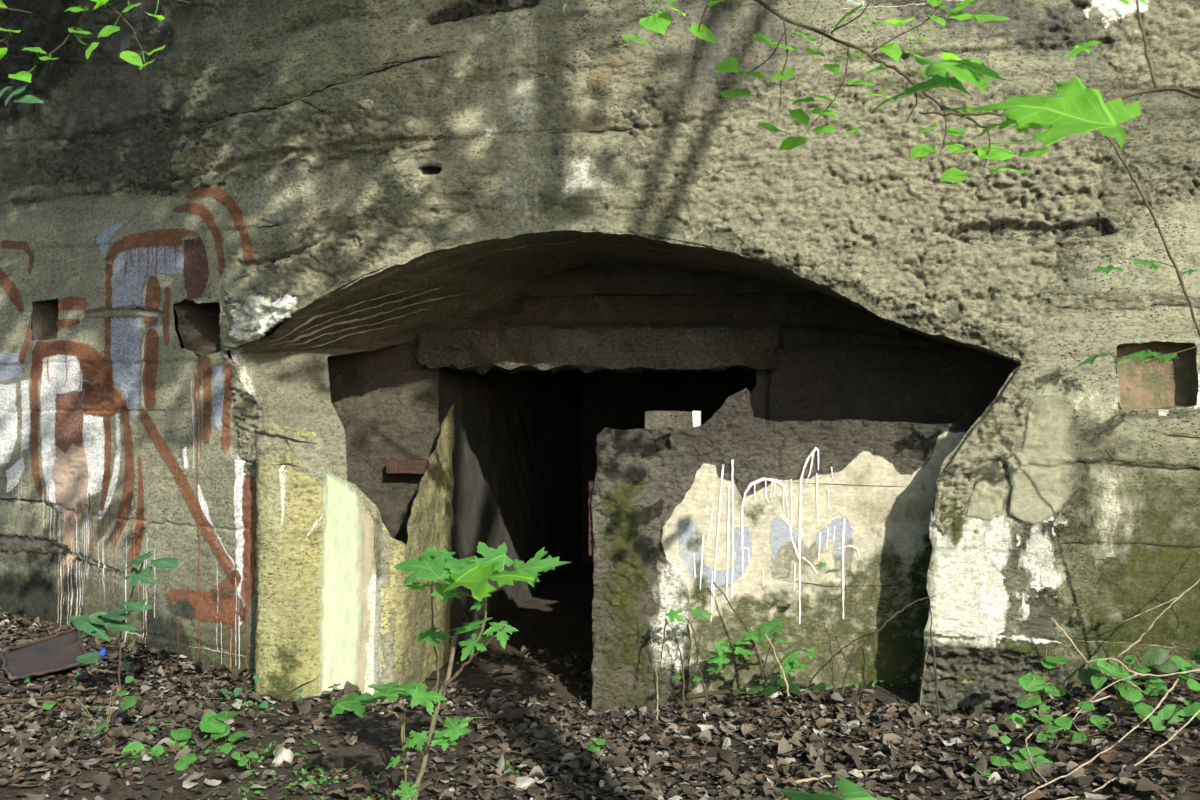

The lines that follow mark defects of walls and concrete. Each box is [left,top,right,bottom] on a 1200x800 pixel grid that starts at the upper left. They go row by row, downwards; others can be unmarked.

spalling [427,0,538,24]
spalling [1079,0,1200,90]
water stain [1098,473,1131,556]